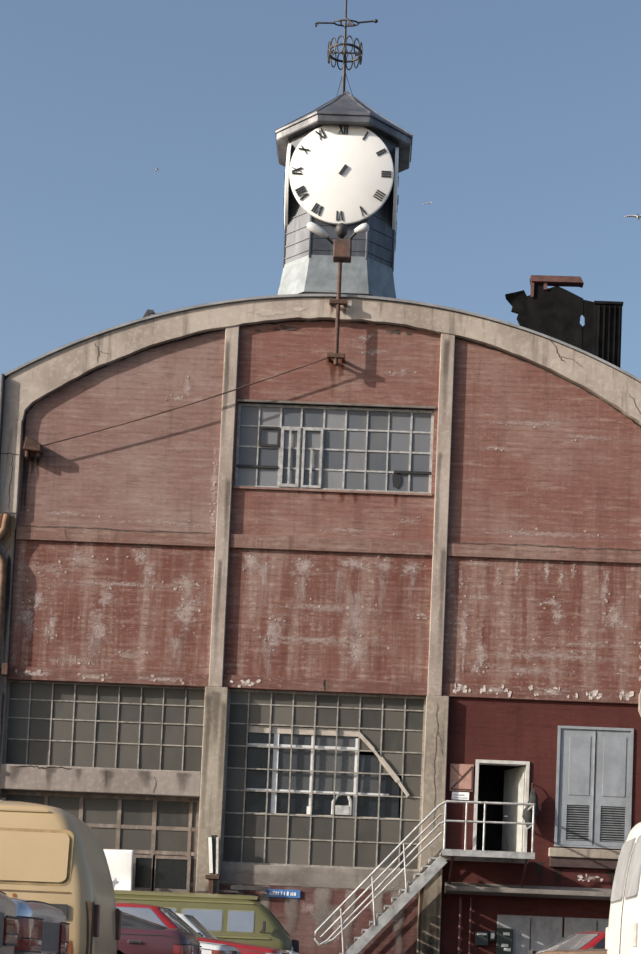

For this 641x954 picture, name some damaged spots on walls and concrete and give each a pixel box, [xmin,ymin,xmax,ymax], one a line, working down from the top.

crack [1,320,641,507]
crack [23,525,205,539]
crack [448,542,632,550]
peeling [602,574,622,625]
peeling [452,684,512,697]
peeling [529,677,602,700]